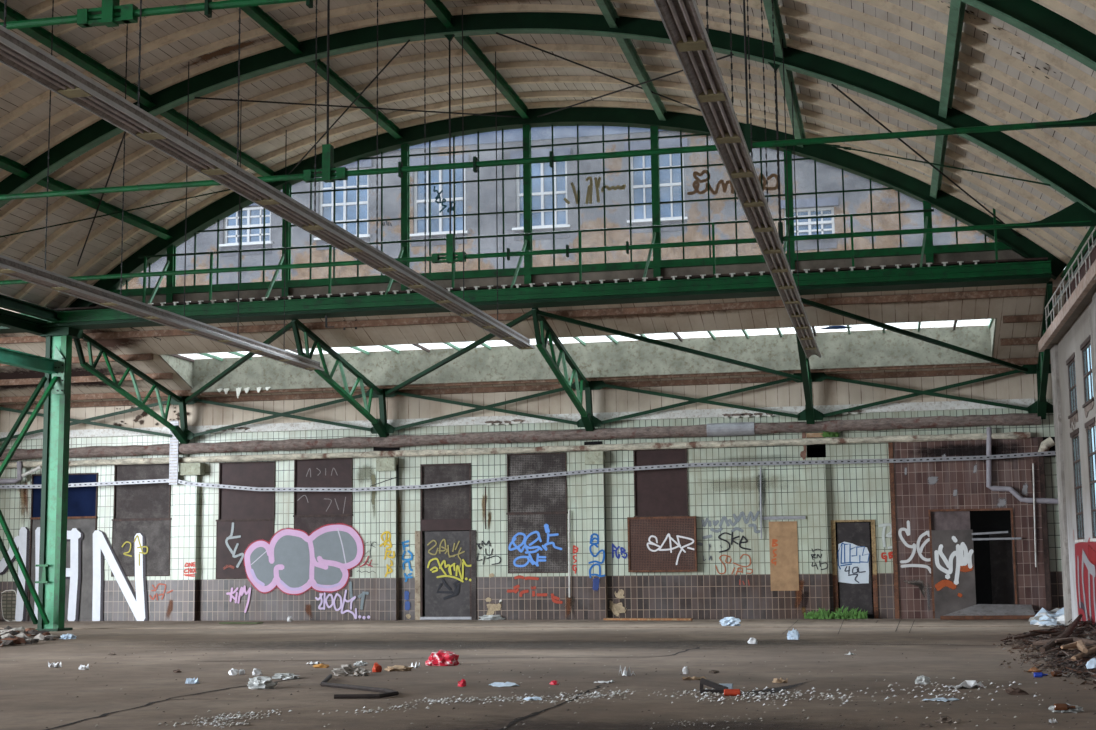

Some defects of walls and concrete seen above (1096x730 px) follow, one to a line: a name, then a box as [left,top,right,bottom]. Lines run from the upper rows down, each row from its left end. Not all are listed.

crack [45,686,243,730]